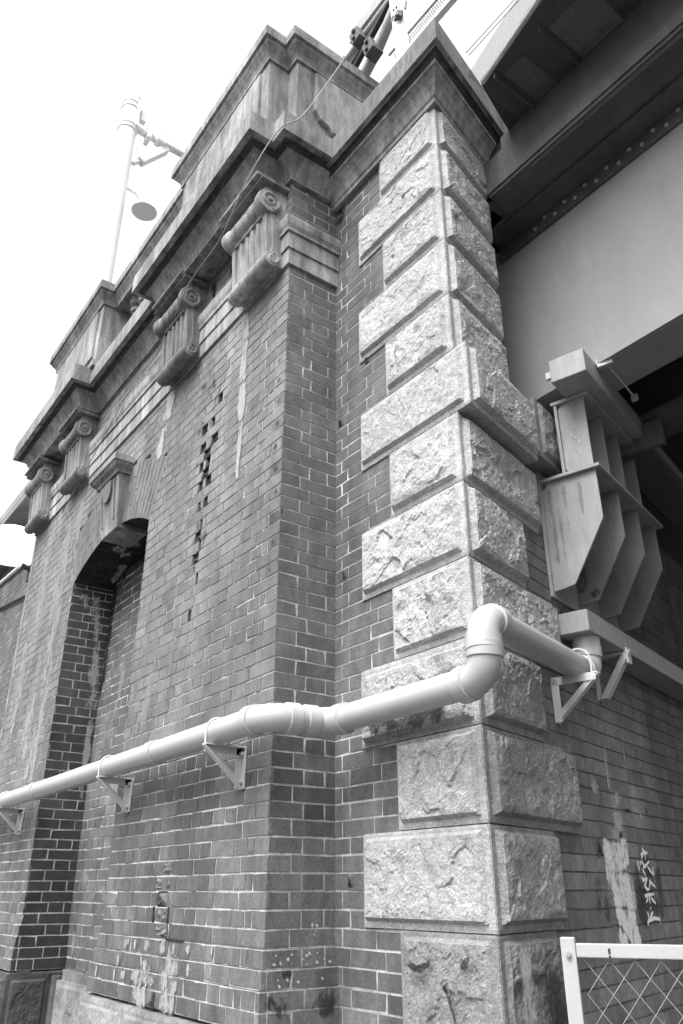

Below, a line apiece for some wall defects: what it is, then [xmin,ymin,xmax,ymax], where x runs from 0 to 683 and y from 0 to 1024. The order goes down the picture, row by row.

damp [156,388,176,460]
damp [236,313,249,480]
crack [188,380,223,618]
damp [80,587,117,706]
damp [82,721,93,766]
damp [592,746,664,944]
damp [113,938,190,1014]